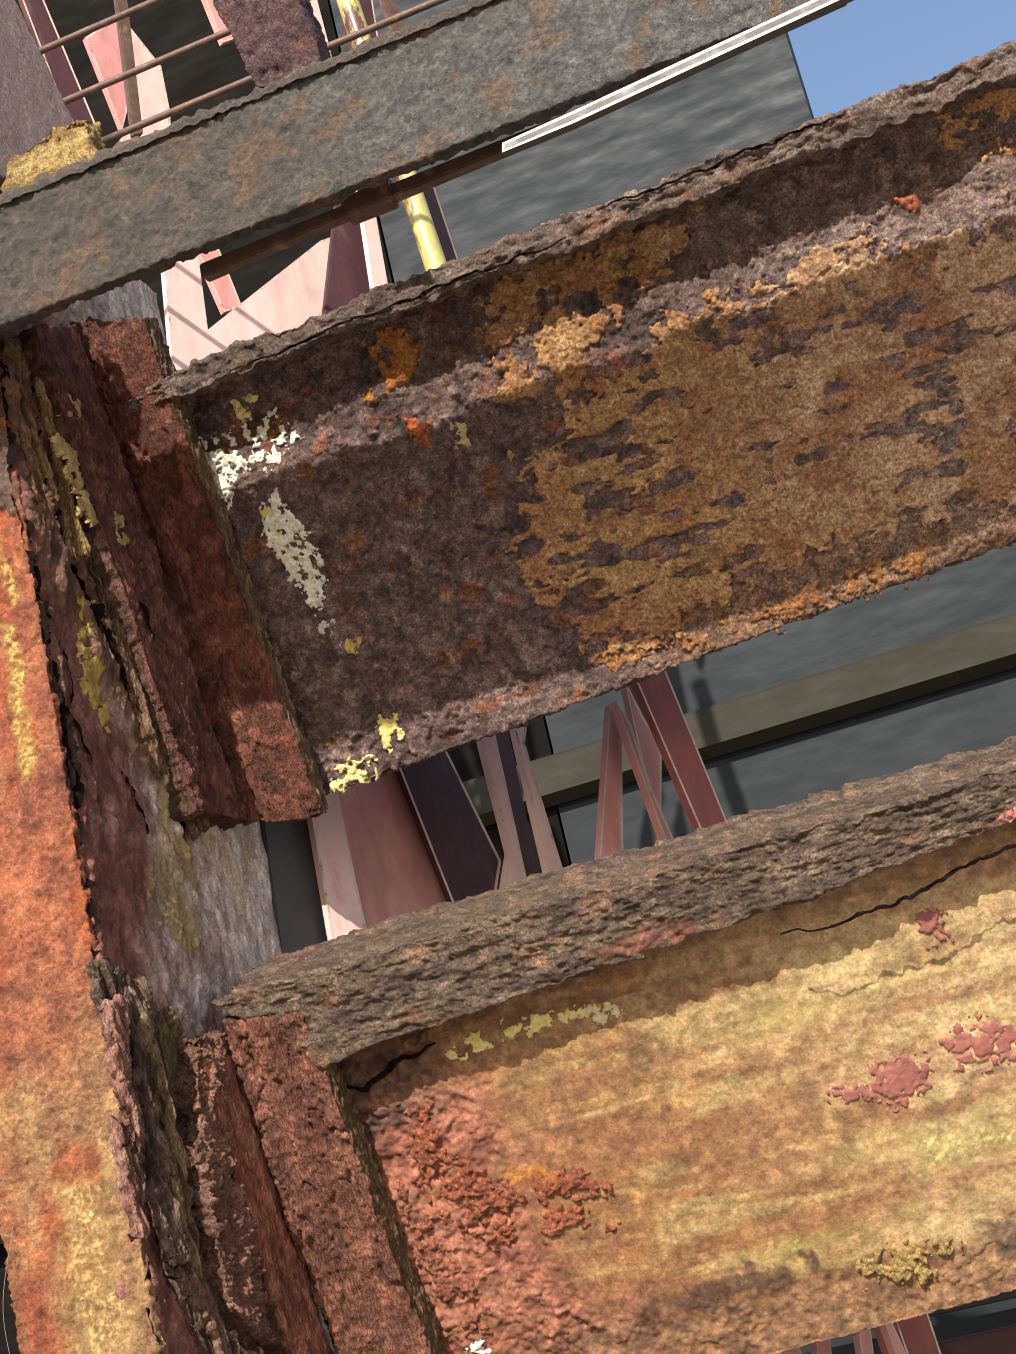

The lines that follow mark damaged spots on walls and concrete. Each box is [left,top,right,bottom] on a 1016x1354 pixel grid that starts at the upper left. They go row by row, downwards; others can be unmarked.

corrosion [934,87,1016,163]
corrosion [888,193,922,213]
corrosion [363,324,421,403]
corrosion [392,414,433,449]
corrosion [469,204,1016,672]
corrosion [0,337,171,780]
crack [0,359,187,990]
crack [780,843,1016,935]
crack [347,1042,436,1093]
corrosion [54,957,244,1354]
corrosion [386,1093,622,1344]
corrosion [855,1237,965,1291]